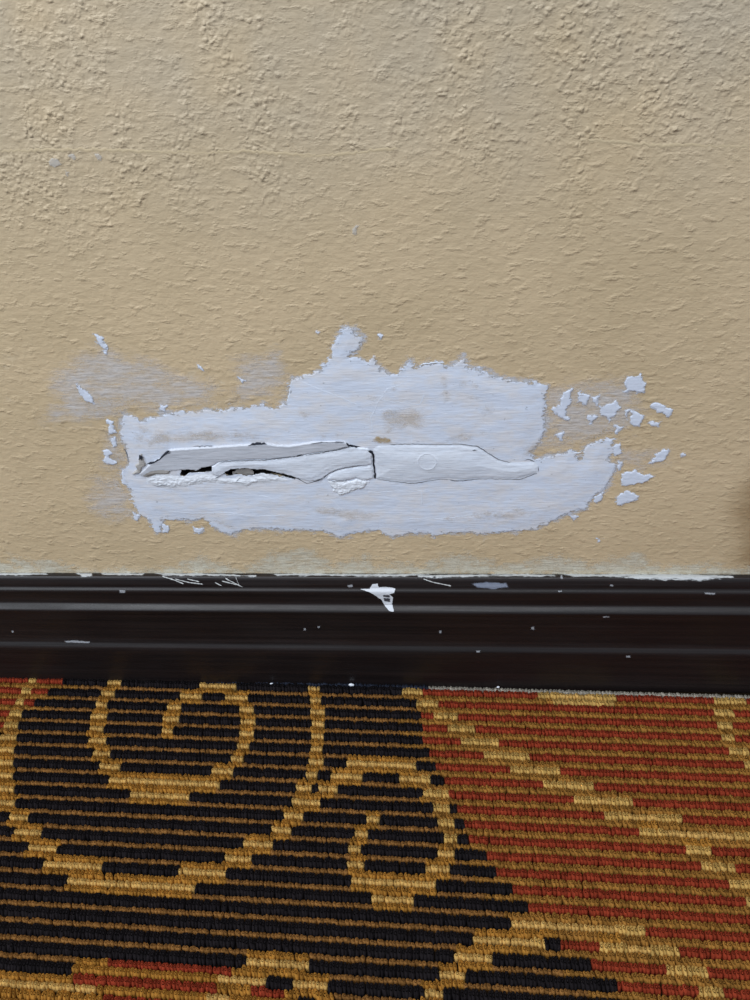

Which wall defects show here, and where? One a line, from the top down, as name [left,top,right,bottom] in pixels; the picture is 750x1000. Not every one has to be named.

peeling [94,334,108,355]
peeling [102,419,127,485]
crack [124,449,170,486]
peeling [139,441,374,496]
crack [193,441,539,484]
peeling [550,373,686,506]